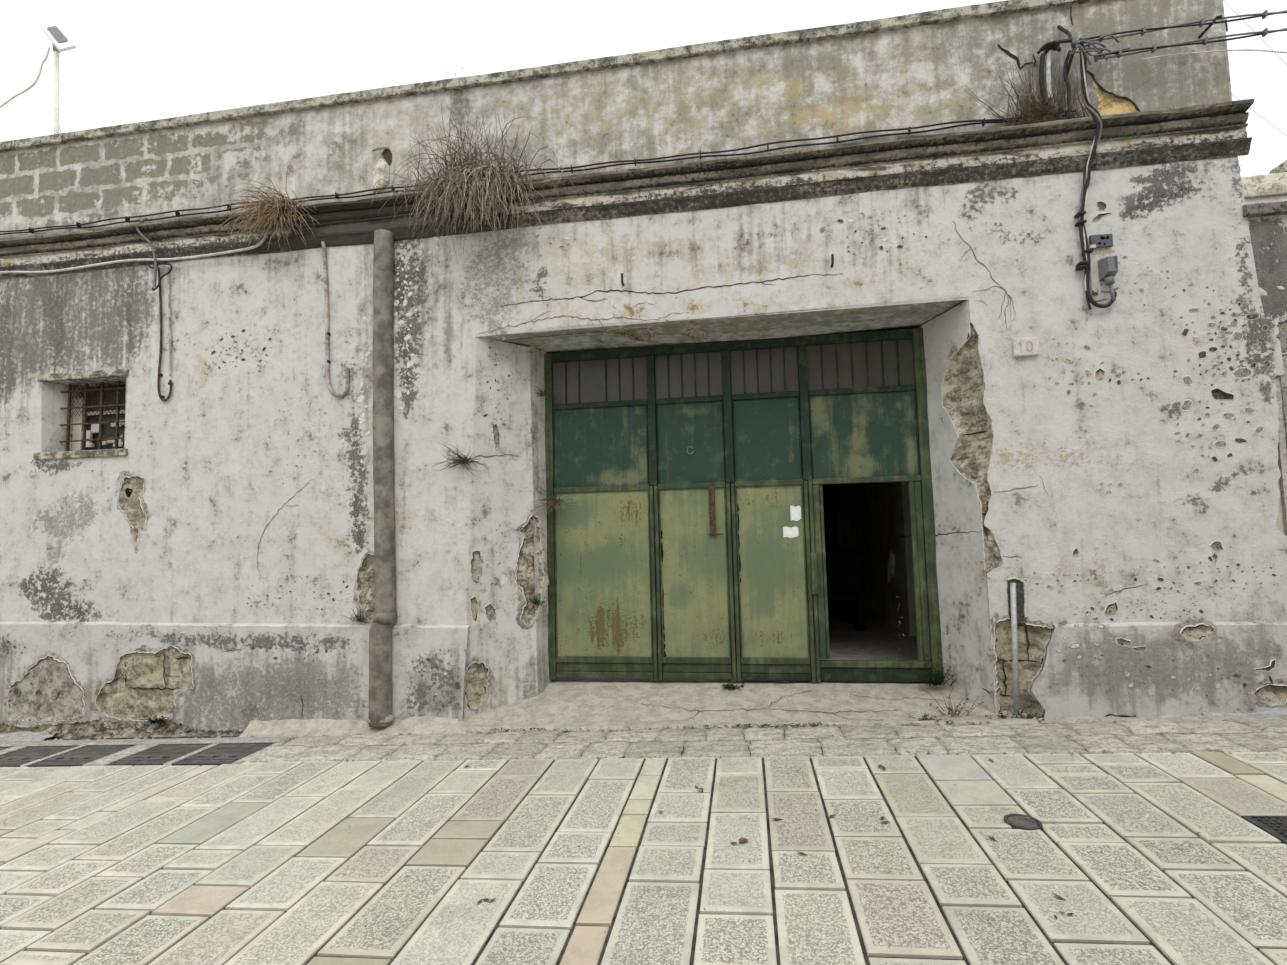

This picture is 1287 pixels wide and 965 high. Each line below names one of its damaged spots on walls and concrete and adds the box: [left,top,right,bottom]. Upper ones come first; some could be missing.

damp [0,266,154,403]
damp [393,239,428,419]
crack [483,274,837,342]
flaking render [941,324,1004,572]
damp [18,492,110,622]
flaking render [0,641,244,739]
flaking render [107,470,157,553]
flaking render [247,550,375,624]
flaking render [421,649,495,711]
flaking render [470,510,549,631]
flaking render [982,540,1287,718]